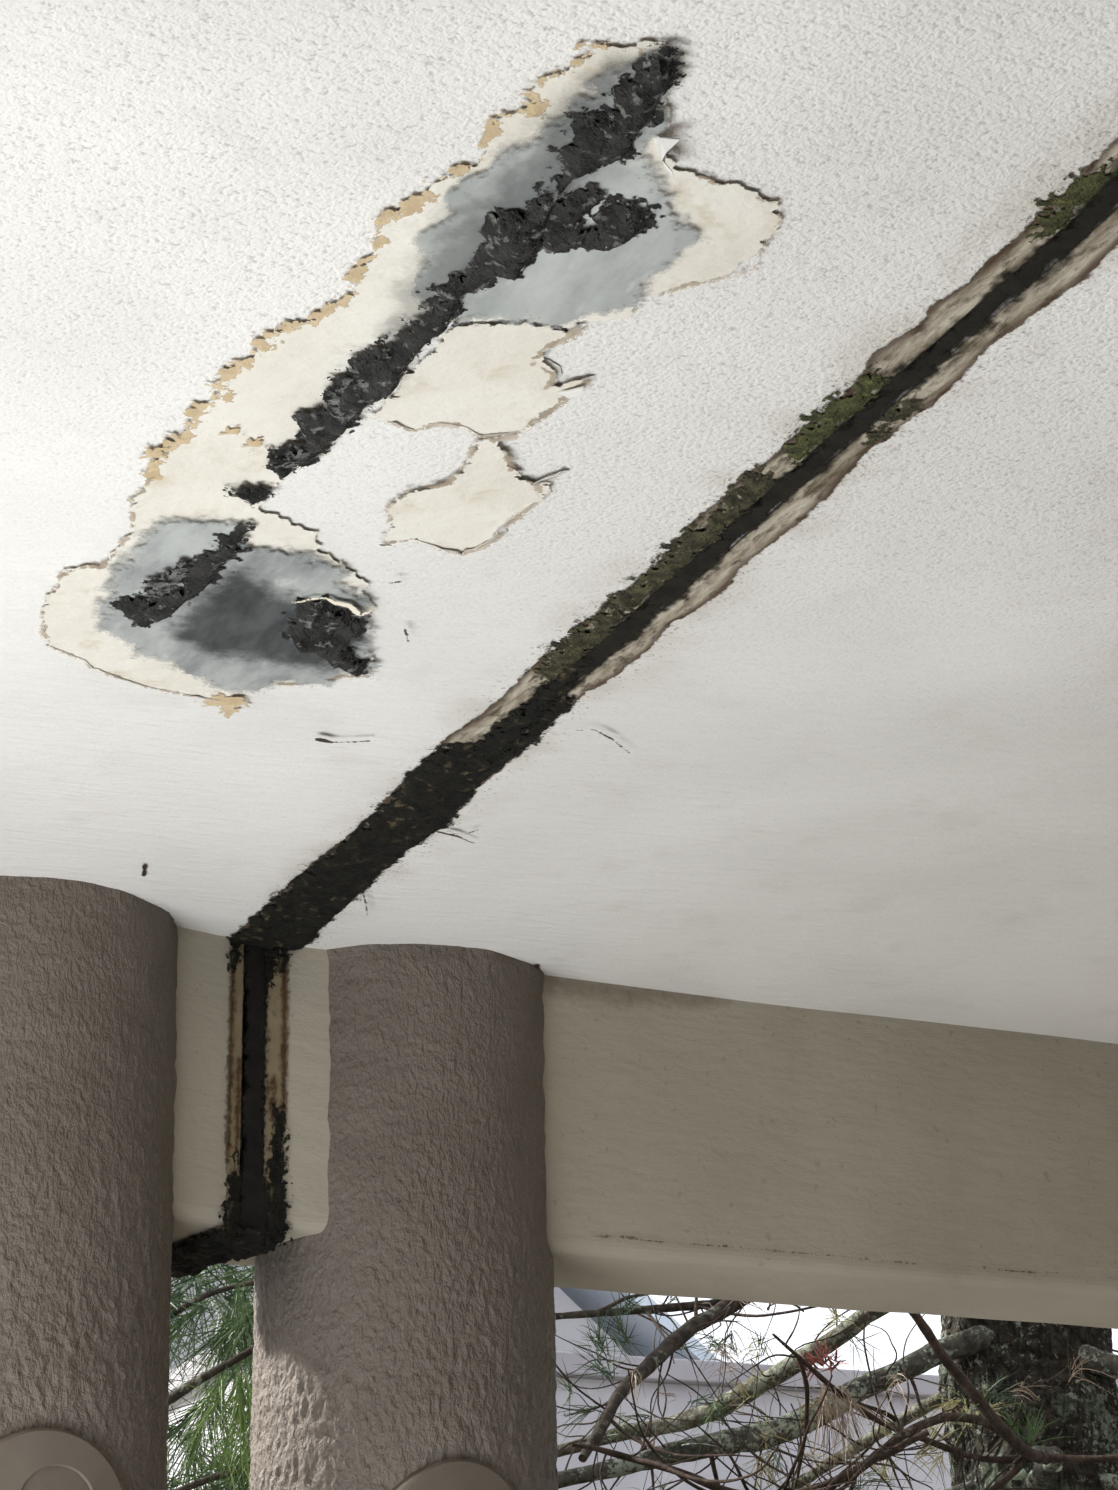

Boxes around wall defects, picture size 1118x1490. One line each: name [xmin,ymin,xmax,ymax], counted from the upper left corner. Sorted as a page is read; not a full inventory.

peeling [39,39,783,719]
crack [265,43,687,480]
water stain [411,52,699,329]
crack [109,522,256,628]
water stain [95,518,379,693]
crack [315,736,370,744]
crack [435,830,477,843]
water stain [171,173,1118,1278]